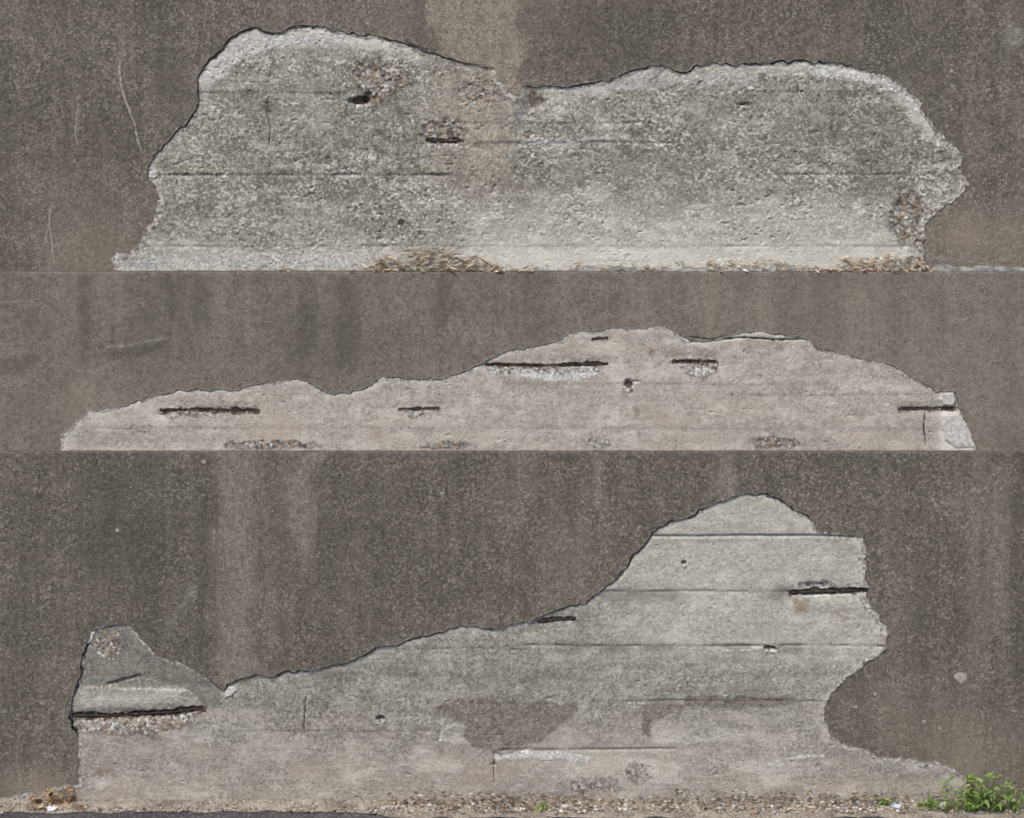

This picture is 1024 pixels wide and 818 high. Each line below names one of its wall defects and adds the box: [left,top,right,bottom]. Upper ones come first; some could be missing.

spalling [111,22,970,271]
spalling [60,325,976,464]
spalling [0,493,968,800]
leakage [433,697,591,762]